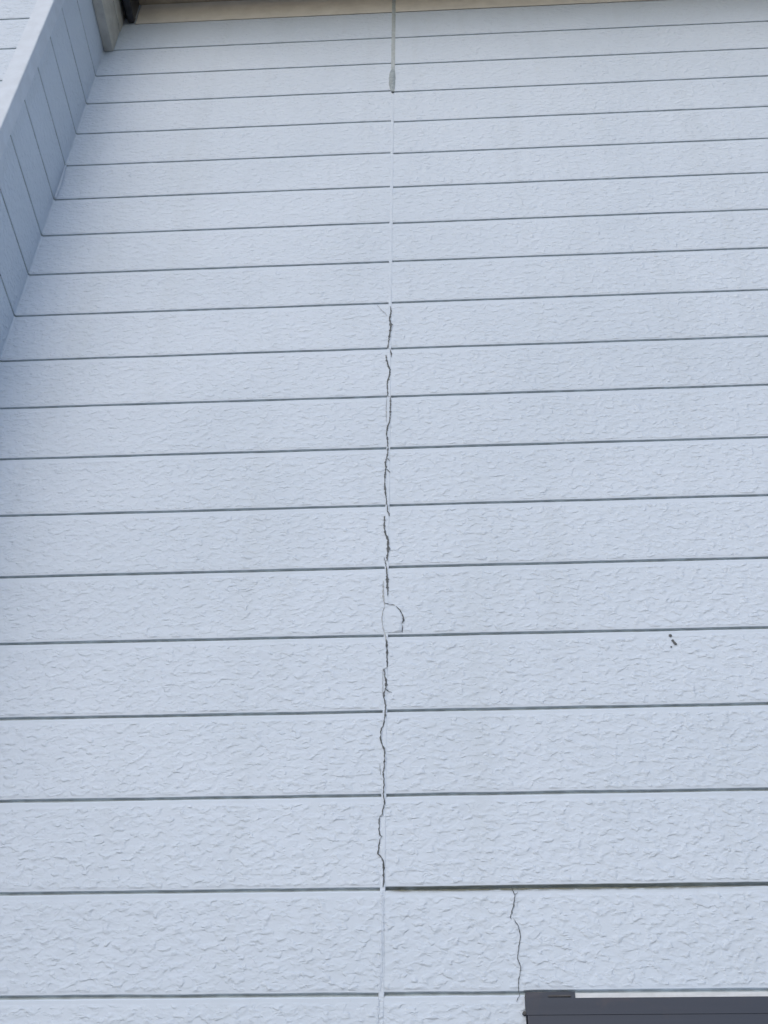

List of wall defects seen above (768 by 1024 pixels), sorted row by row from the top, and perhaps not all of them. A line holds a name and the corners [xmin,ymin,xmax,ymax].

crack [376,305,404,1024]
crack [510,890,521,1002]